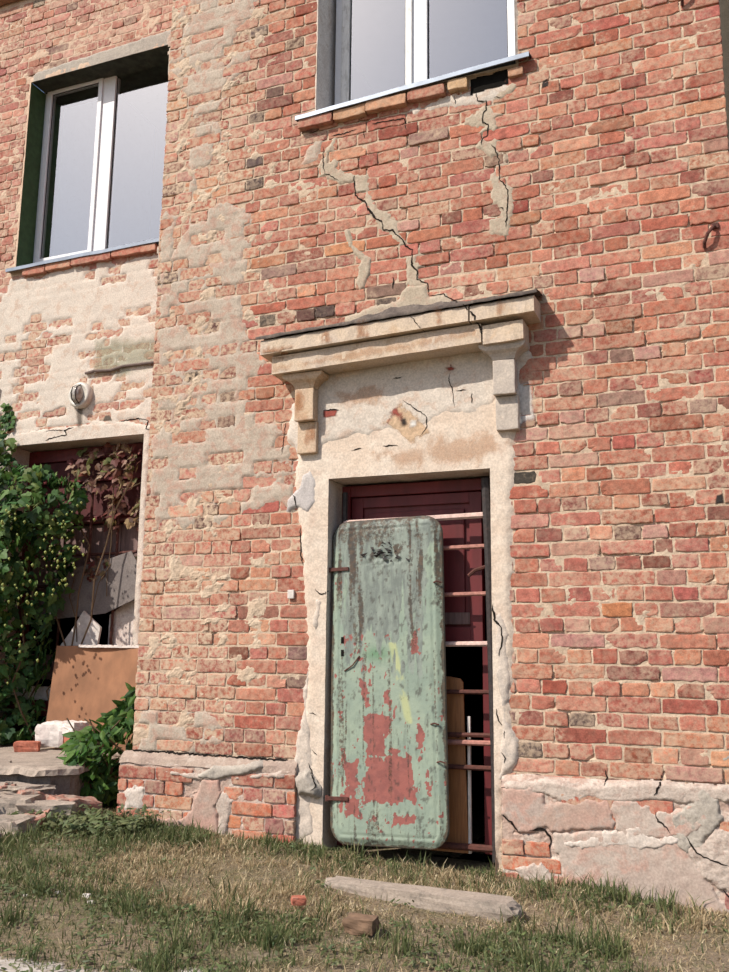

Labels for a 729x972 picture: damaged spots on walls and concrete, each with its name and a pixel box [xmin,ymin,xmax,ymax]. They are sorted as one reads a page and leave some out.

flaking render [167,0,261,196]
crack [317,118,483,339]
crack [454,83,518,240]
flaking render [0,202,297,532]
flaking render [387,404,428,442]
flaking render [153,779,222,834]
crack [503,815,552,849]
crack [654,775,728,866]